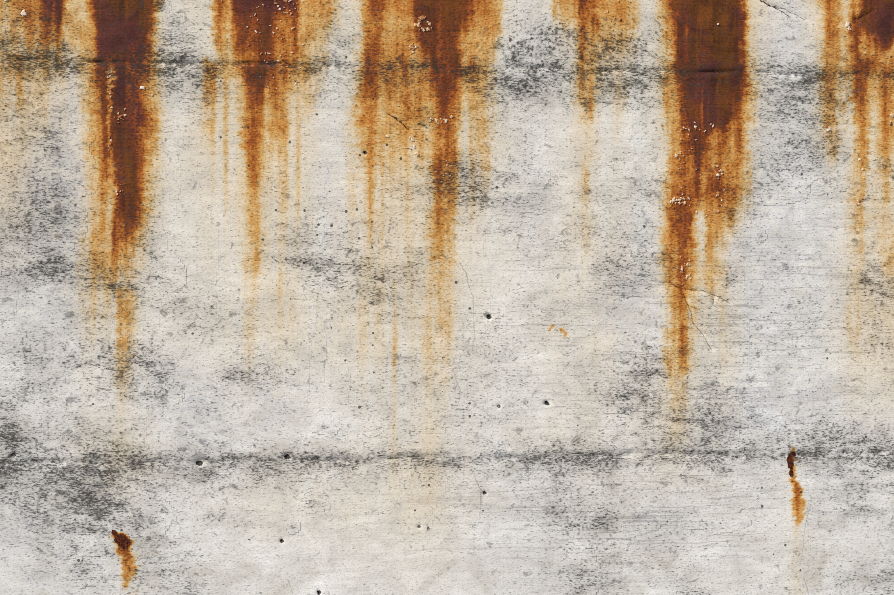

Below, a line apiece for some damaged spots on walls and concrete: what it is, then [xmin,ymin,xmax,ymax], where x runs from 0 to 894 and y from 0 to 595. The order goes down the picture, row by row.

rust [0,0,152,51]
rust [0,70,527,451]
rust [167,0,516,61]
damp [0,0,894,226]
rust [539,0,894,371]
rust [812,79,894,443]
rust [387,470,469,554]
damp [0,364,894,595]
rust [781,471,812,595]